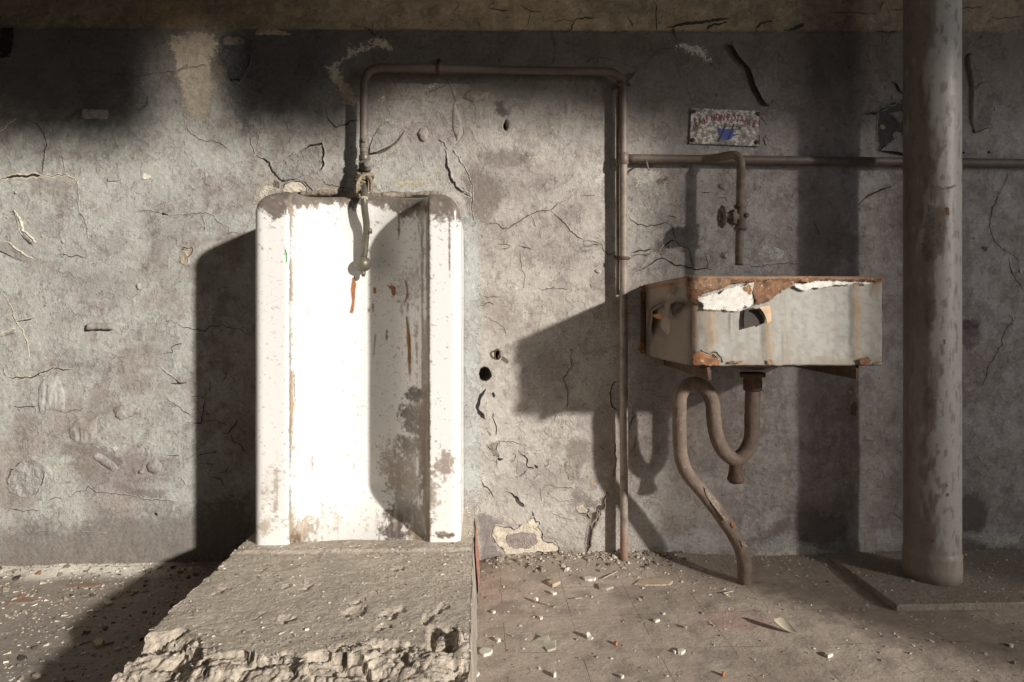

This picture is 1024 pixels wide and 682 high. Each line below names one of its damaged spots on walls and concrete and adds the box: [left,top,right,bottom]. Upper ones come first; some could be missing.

peeling [167,17,291,123]
peeling [324,34,394,110]
spalling [875,97,903,156]
peeling [0,210,36,264]
crack [0,107,89,259]
crack [427,77,794,335]
crack [981,172,1023,386]
crack [473,380,638,553]
spalling [491,498,561,556]